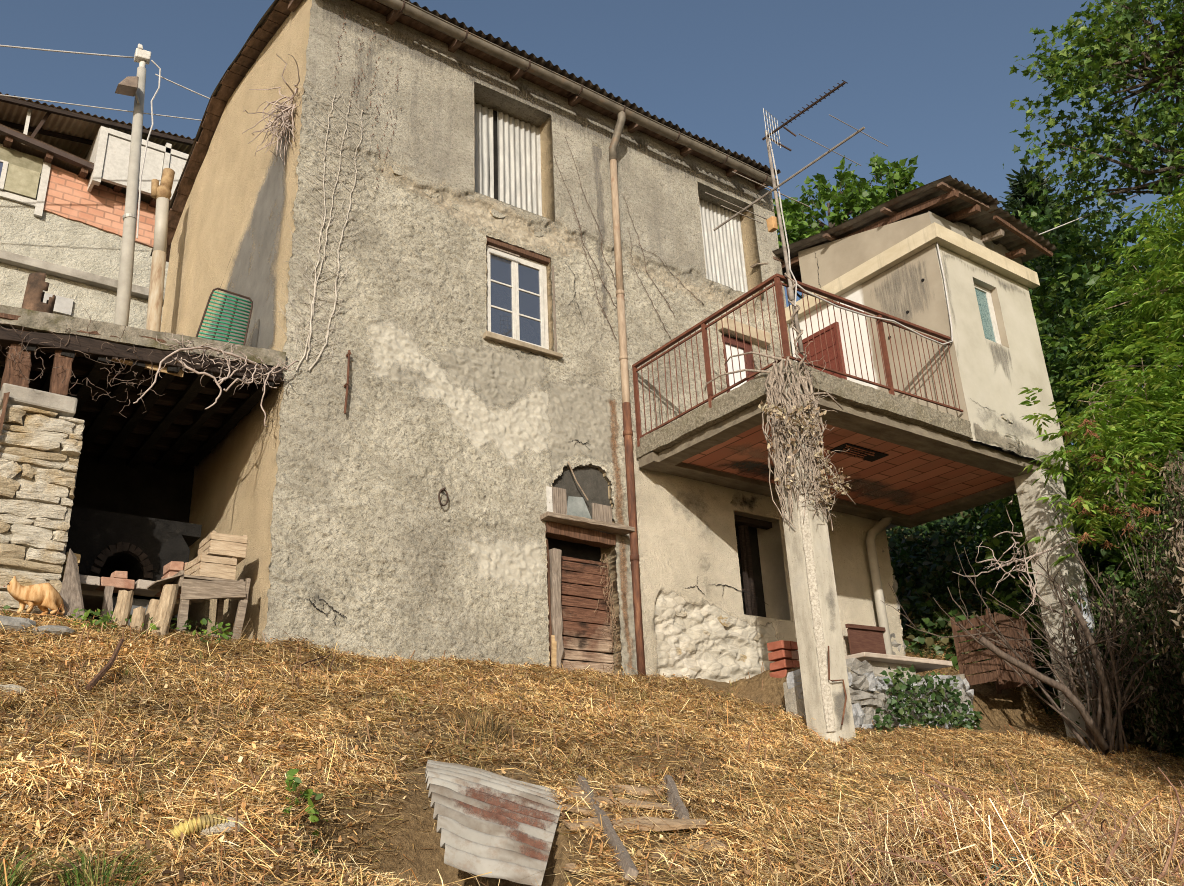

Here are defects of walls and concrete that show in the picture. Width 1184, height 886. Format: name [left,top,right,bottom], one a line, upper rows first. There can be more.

spalling [373,156,583,257]
crack [306,595,347,626]